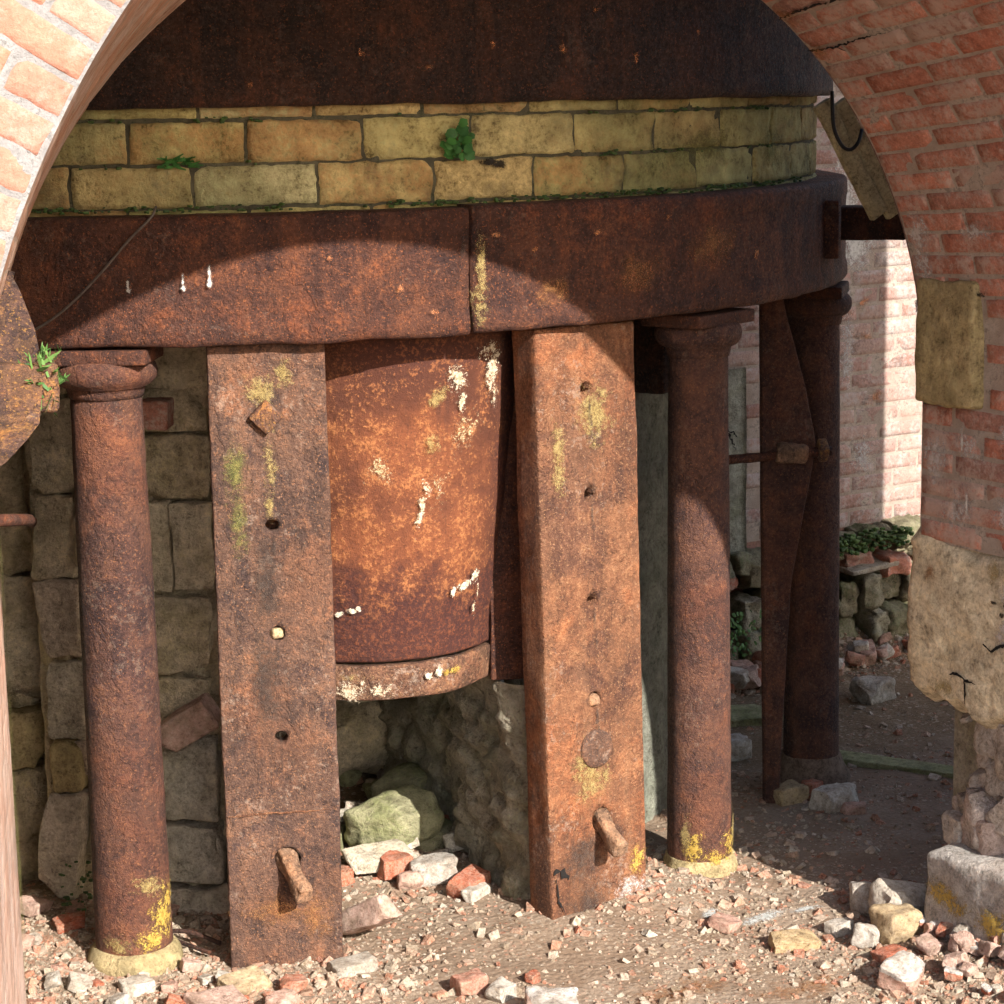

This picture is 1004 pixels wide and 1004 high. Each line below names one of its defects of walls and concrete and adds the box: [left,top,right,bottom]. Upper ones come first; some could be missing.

crack [779,0,836,20]
crack [807,32,889,52]
corrosion [474,250,486,319]
corrosion [580,389,606,445]
corrosion [553,429,564,489]
crack [982,644,1004,653]
crack [949,672,975,704]
corrosion [575,757,609,800]